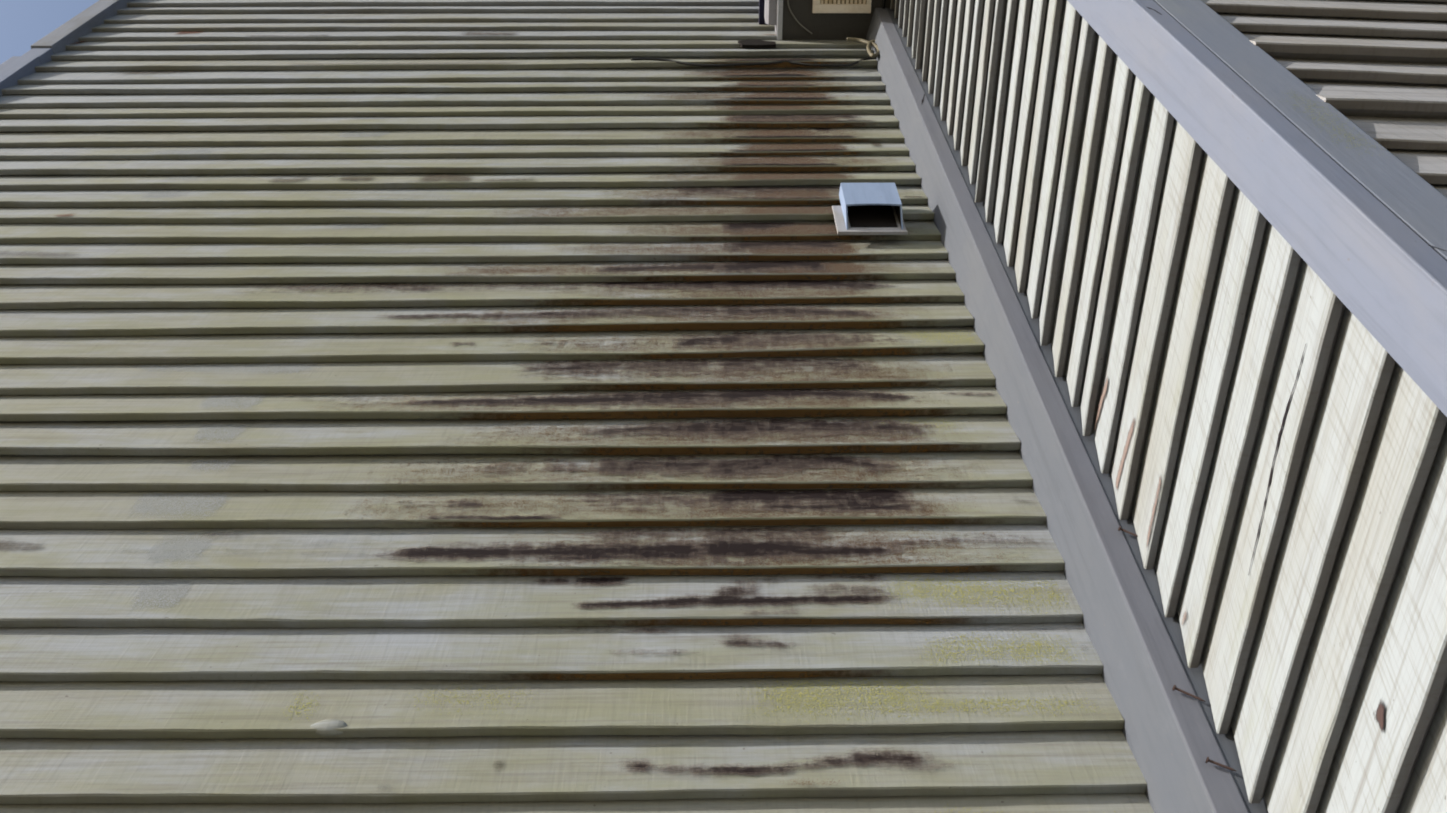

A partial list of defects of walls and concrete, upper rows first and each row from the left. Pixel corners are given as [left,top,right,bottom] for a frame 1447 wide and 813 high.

water stain [140,176,200,198]
water stain [265,58,1028,646]
water stain [513,670,872,680]
water stain [626,750,935,786]